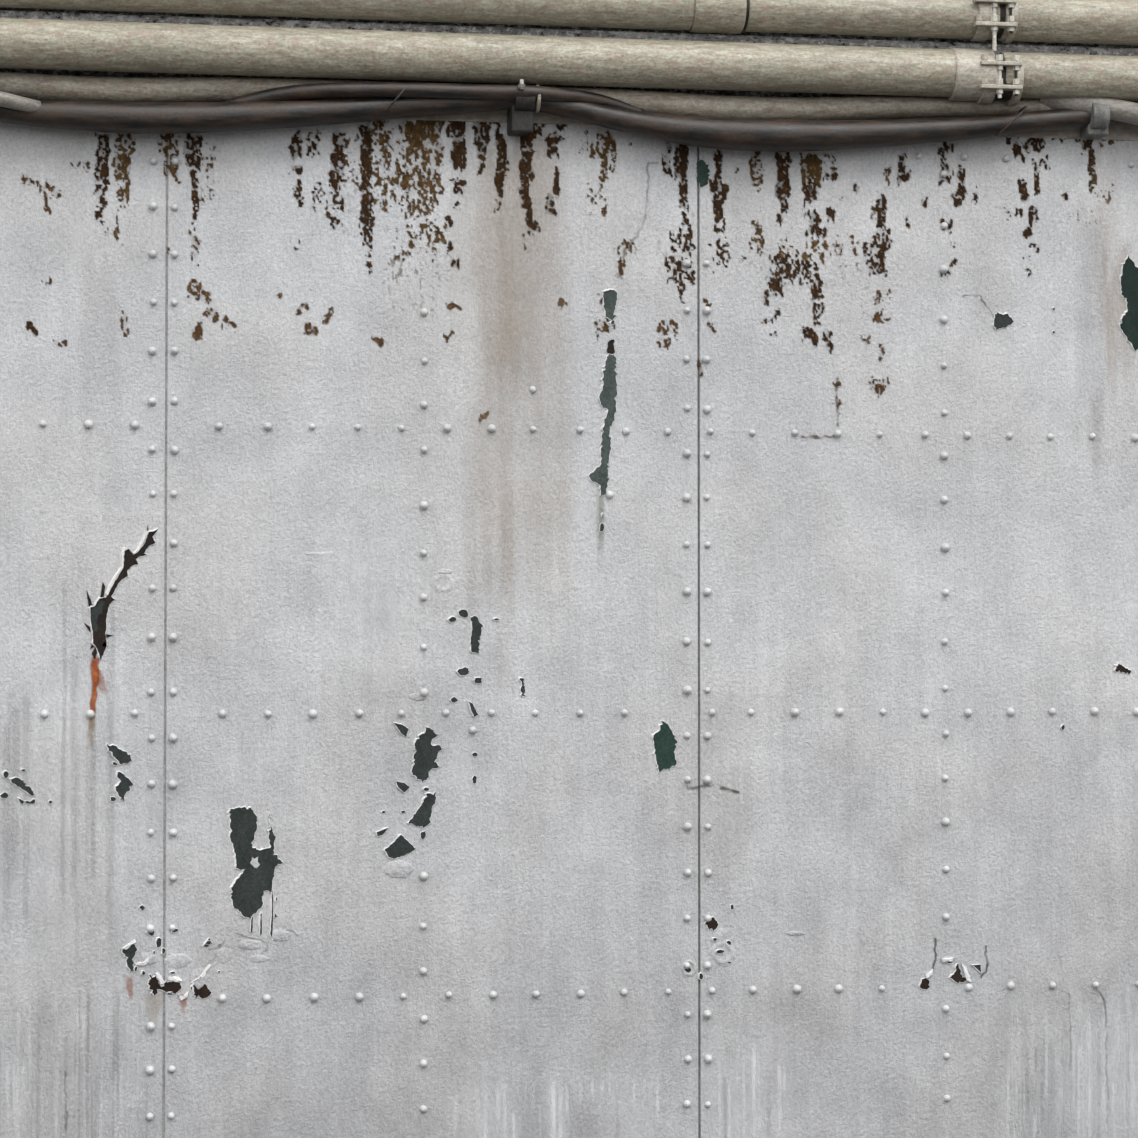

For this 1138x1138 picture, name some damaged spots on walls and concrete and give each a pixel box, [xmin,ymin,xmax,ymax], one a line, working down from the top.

rust [70,132,136,240]
rust [158,133,237,340]
rust [288,120,567,274]
rust [579,130,617,216]
rust [662,142,911,354]
rust [1004,137,1117,273]
peeling [1119,255,1138,351]
peeling [588,339,618,496]
peeling [375,722,444,860]
peeling [651,720,678,772]
peeling [226,806,284,940]
peeling [121,928,221,1000]